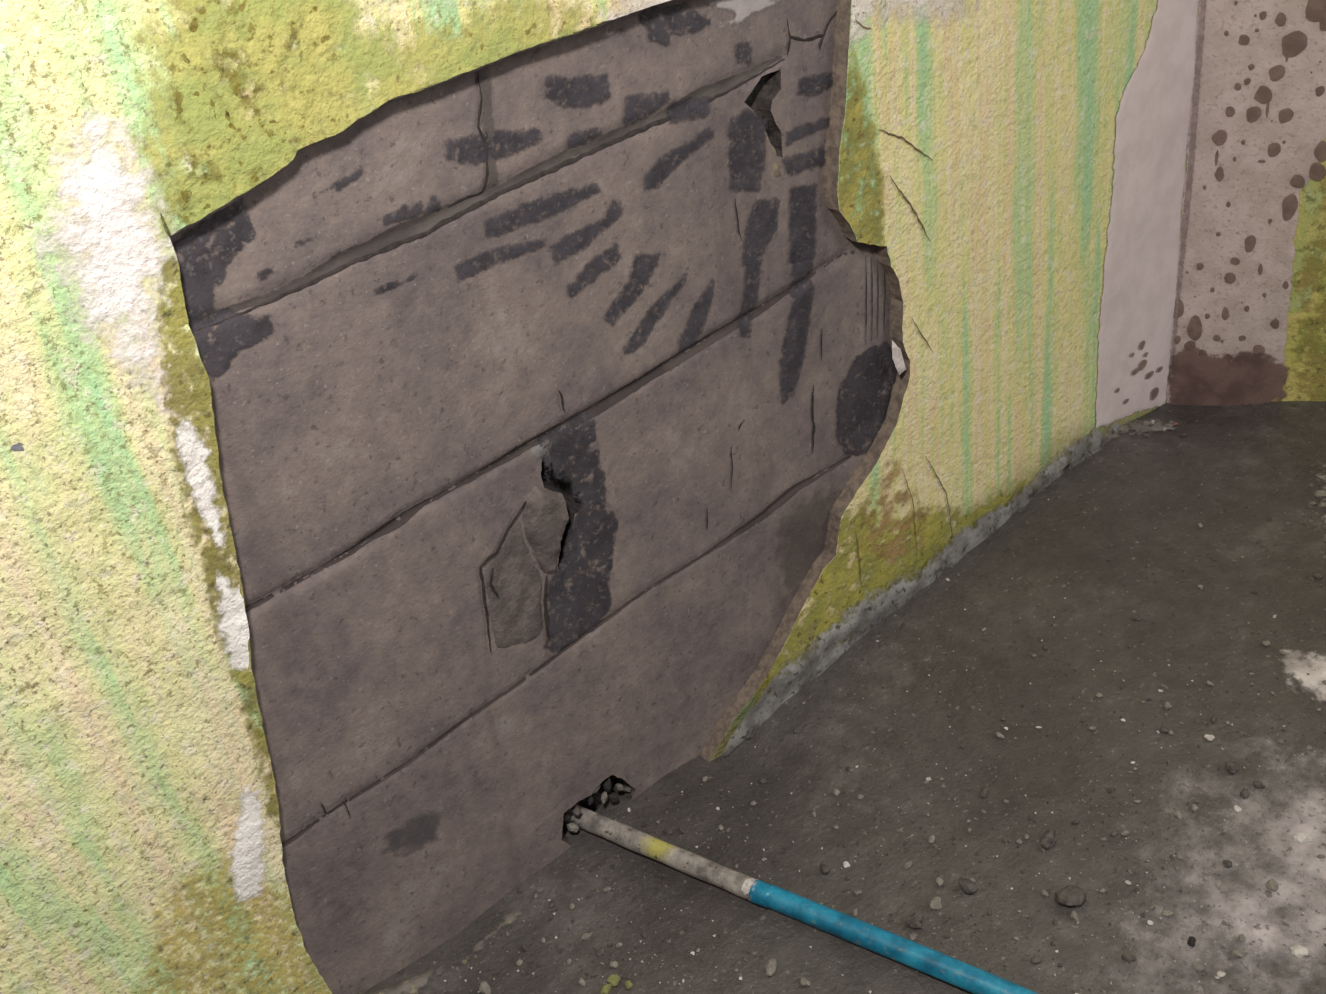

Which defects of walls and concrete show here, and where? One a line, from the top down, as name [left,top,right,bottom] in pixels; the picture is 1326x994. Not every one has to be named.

damp [37,0,775,842]
crack [447,75,489,206]
spalling [160,0,910,994]
damp [546,61,885,404]
damp [836,341,898,456]
crack [879,129,933,161]
crack [890,176,930,241]
damp [850,0,979,44]
damp [717,419,1177,761]
damp [1131,201,1326,406]
damp [1203,0,1326,190]
damp [1283,650,1326,701]